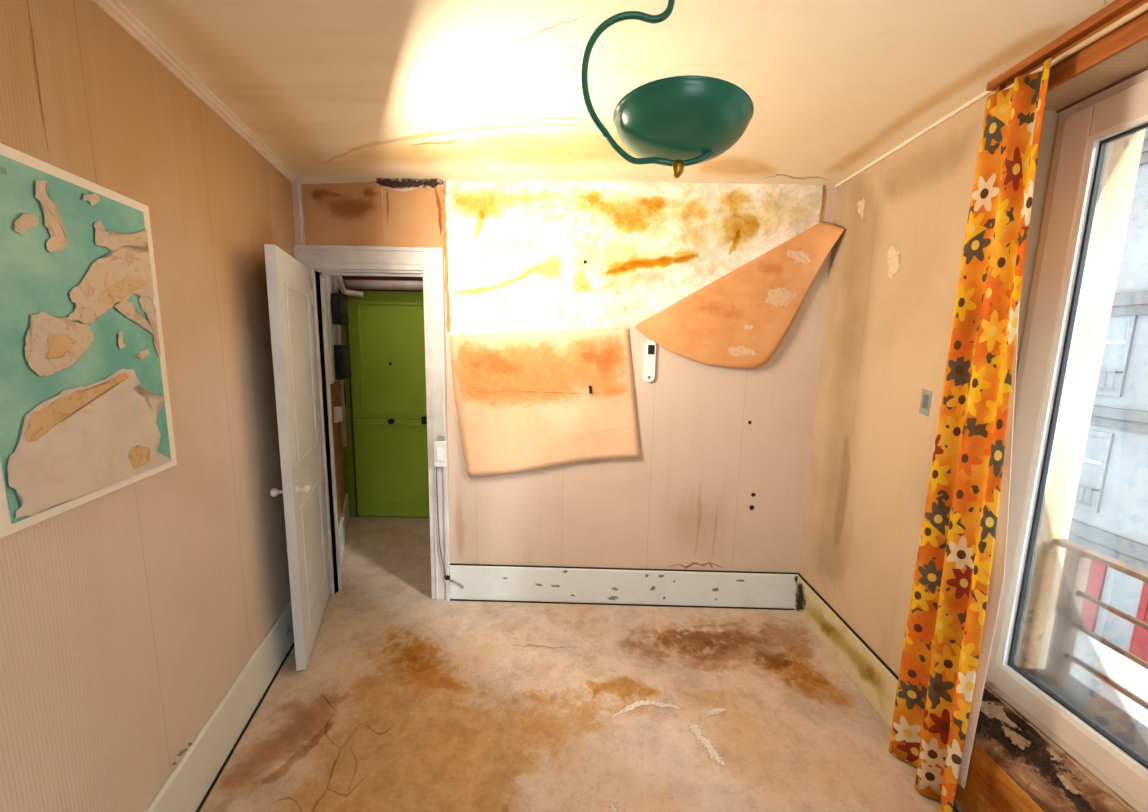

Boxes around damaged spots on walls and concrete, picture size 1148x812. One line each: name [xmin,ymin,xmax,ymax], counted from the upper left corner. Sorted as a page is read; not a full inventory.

damp [376,178,443,189]
flaking render [441,180,826,335]
damp [794,575,806,611]
damp [976,688,1096,812]